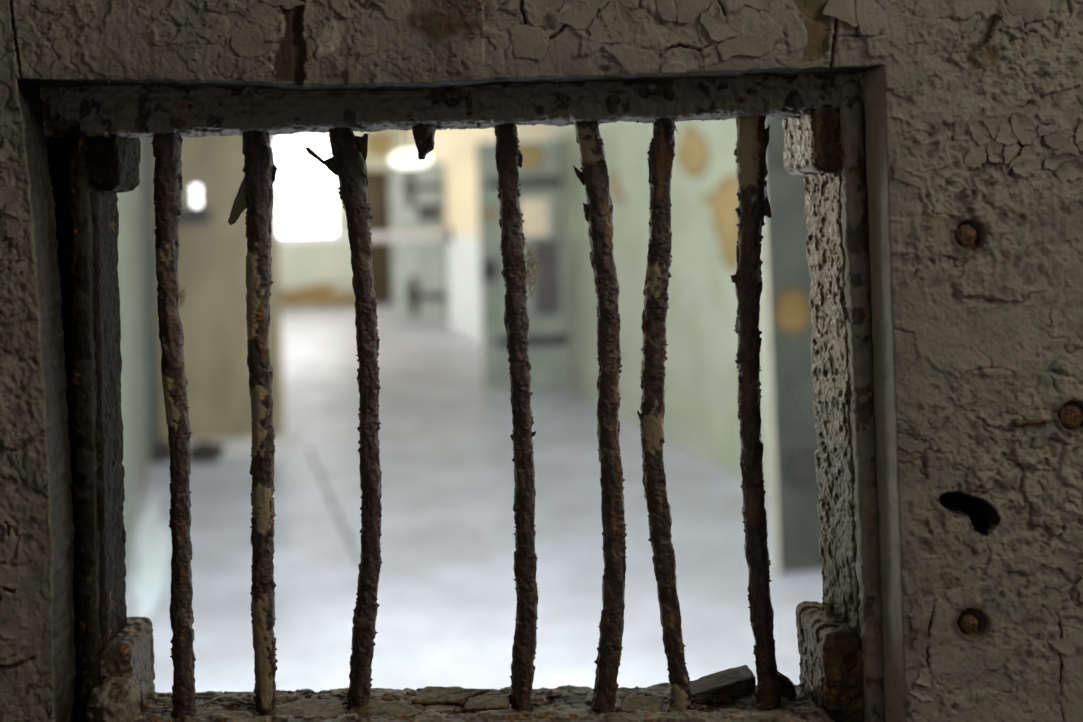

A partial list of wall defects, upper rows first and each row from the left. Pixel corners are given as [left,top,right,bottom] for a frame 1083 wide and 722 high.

crack [519,0,527,25]
crack [549,24,568,40]
crack [659,44,711,56]
rust [355,134,368,186]
peeling [964,111,1083,183]
peeling [0,147,28,275]
crack [1057,617,1065,722]